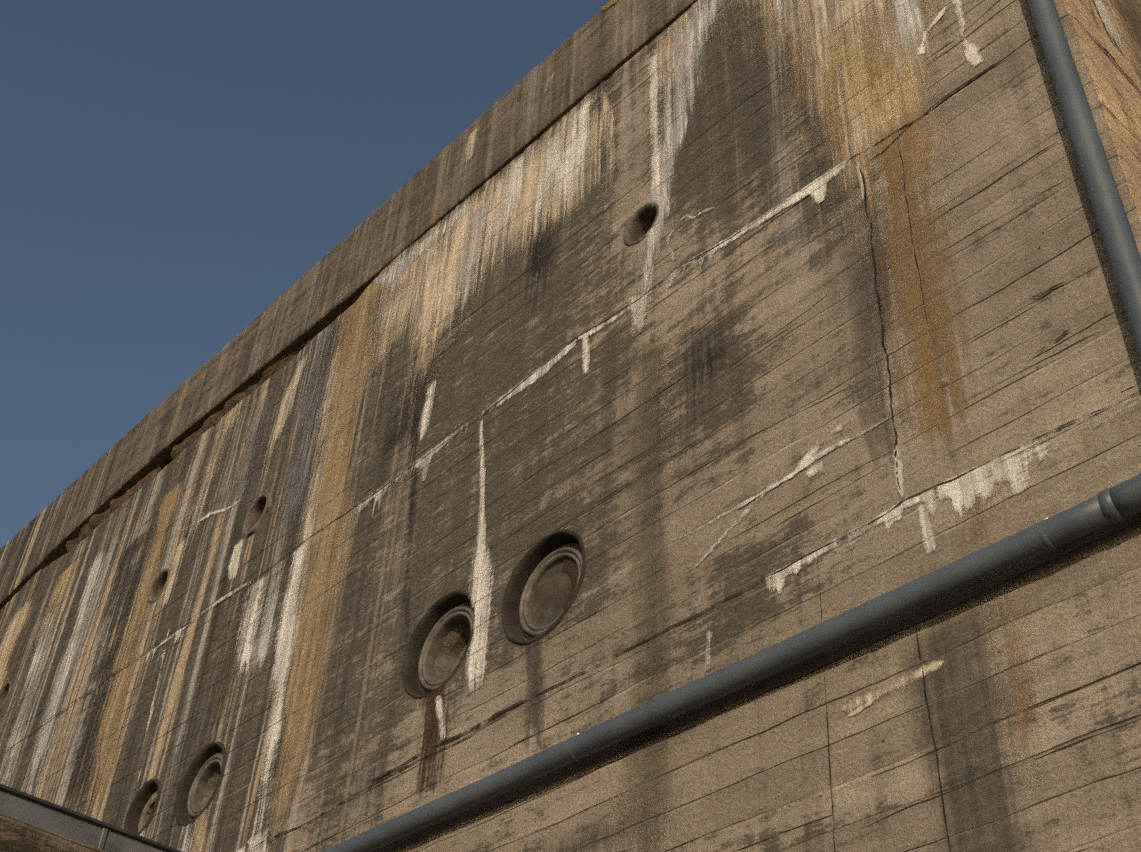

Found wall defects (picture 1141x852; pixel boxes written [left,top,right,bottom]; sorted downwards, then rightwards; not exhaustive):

efflorescence [893,0,983,67]
damp [4,554,104,796]
damp [64,533,150,808]
damp [147,540,307,852]
crack [4,423,472,753]
corrosion [270,260,396,835]
damp [353,91,615,640]
crack [253,51,1020,852]
damp [465,0,854,693]
corrosion [760,0,964,443]
damp [766,437,1055,594]
crack [1033,407,1106,441]